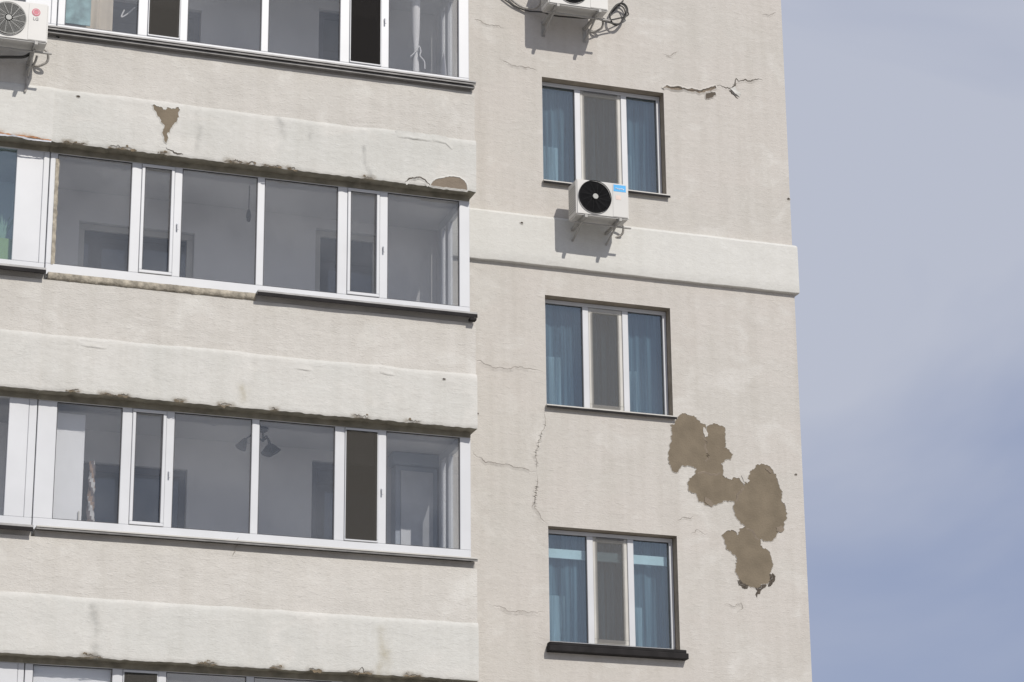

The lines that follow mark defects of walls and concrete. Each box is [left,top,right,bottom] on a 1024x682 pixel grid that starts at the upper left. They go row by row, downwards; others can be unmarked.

crack [661,78,762,100]
spalling [151,103,182,154]
spalling [406,175,469,192]
crack [476,360,542,374]
crack [470,409,548,525]
spalling [667,412,788,596]